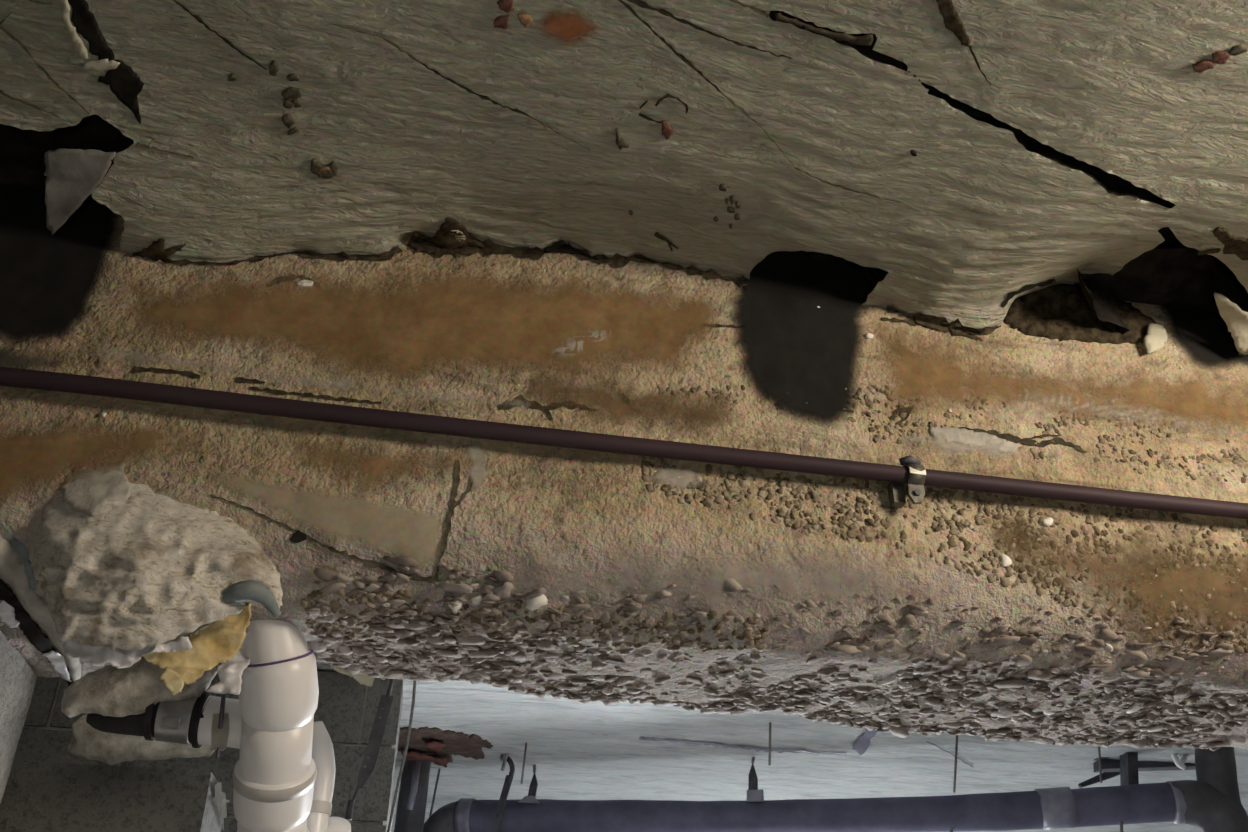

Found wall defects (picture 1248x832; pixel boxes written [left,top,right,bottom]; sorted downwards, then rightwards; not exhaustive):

rust [493,0,595,42]
crack [330,23,590,150]
crack [618,0,900,203]
crack [969,46,991,85]
spalling [1003,284,1157,344]
spalling [658,385,745,406]
crack [952,426,1087,453]
spalling [843,385,1248,483]
crack [210,460,474,584]
spalling [295,457,1248,751]
spalling [397,726,493,768]